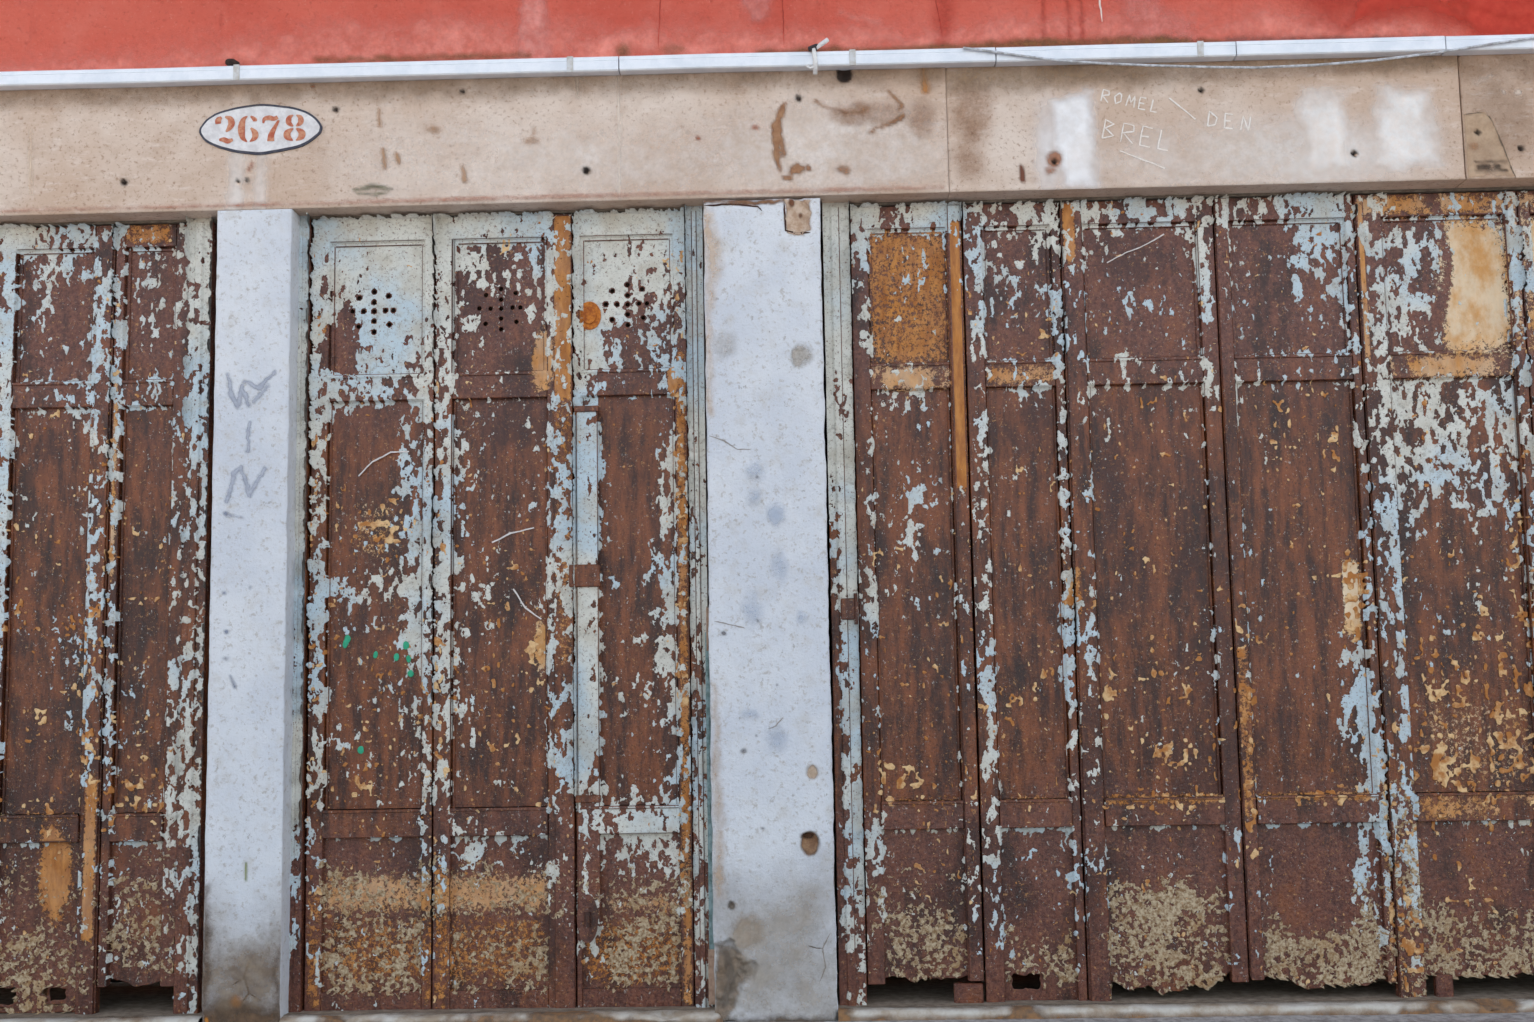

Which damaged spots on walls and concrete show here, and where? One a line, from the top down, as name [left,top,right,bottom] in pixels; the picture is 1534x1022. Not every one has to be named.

peeling [771,103,811,180]
peeling [841,90,905,133]
corrosion [852,221,977,495]
corrosion [986,298,1059,396]
corrosion [1253,381,1345,548]
corrosion [0,349,174,944]
corrosion [306,216,657,1022]
corrosion [578,290,693,1005]
peeling [289,190,1534,1021]
corrosion [863,718,986,909]
corrosion [974,643,1059,757]
corrosion [1084,443,1534,1015]